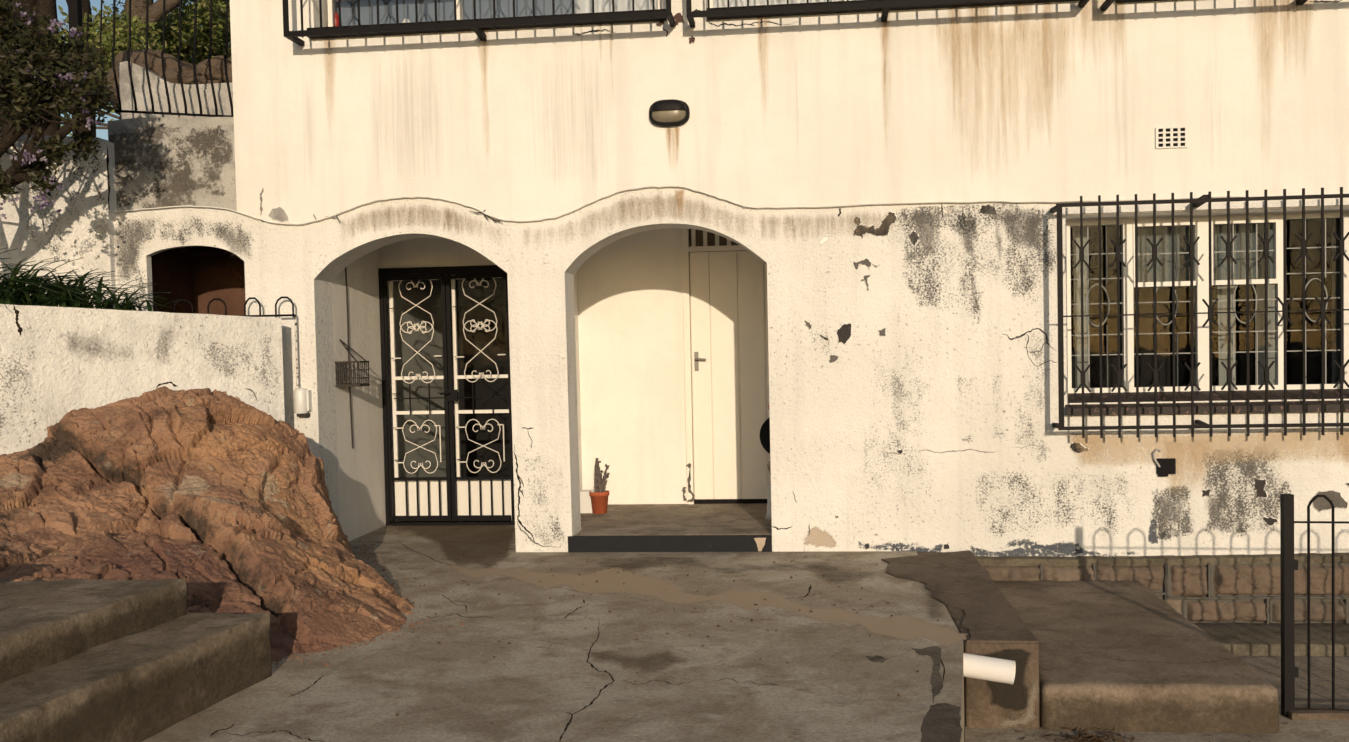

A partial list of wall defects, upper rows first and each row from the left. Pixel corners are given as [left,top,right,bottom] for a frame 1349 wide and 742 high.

damp [20,125,251,305]
peeling [853,258,879,291]
peeling [853,211,897,238]
damp [896,203,1057,321]
peeling [804,321,853,363]
crack [1003,328,1056,367]
crack [514,427,551,547]
flaking render [804,527,836,547]
damp [970,470,1134,557]
rust [1072,431,1349,462]
damp [1148,446,1291,544]
crack [555,587,779,742]